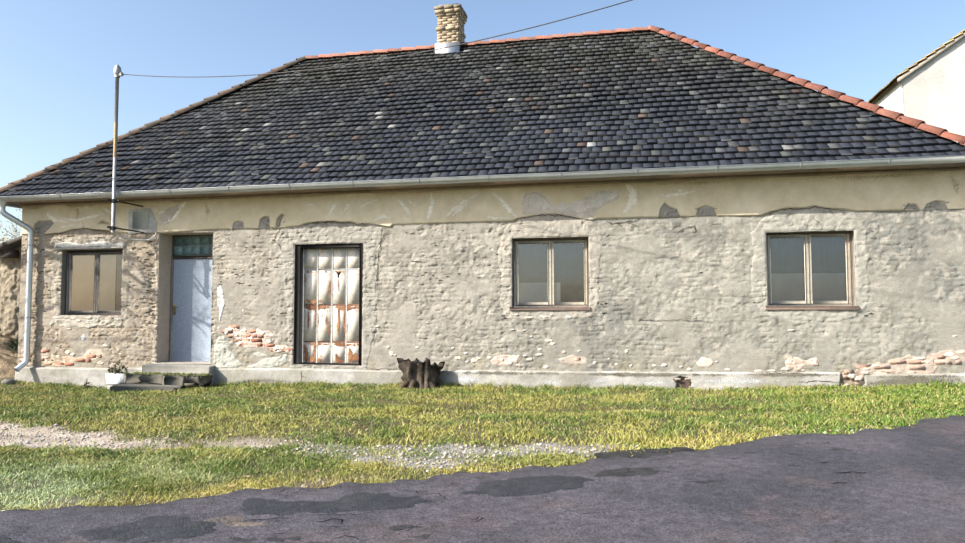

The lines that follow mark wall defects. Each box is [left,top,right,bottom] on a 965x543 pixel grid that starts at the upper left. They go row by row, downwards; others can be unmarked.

spalling [522,190,619,220]
spalling [34,220,54,235]
flaking render [54,237,125,248]
flaking render [214,278,293,352]
corrosion [303,270,359,363]
flaking render [20,316,123,367]
flaking render [840,350,965,387]